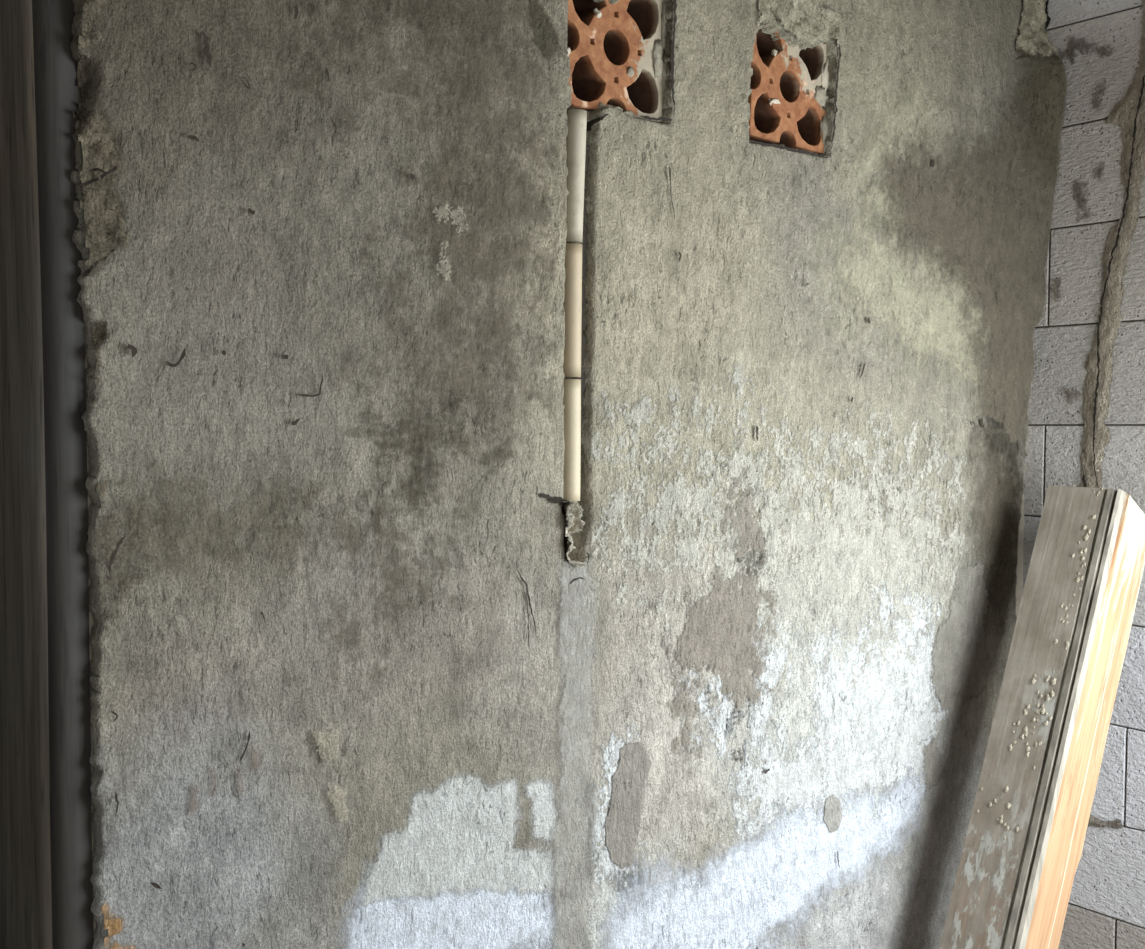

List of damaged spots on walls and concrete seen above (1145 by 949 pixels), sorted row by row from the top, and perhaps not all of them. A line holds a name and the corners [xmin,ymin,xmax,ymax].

flaking render [1016,0,1060,59]
crack [1082,75,1145,488]
leakage [836,82,1058,710]
corrosion [102,903,136,949]
leakage [348,886,558,949]
leakage [607,736,945,949]